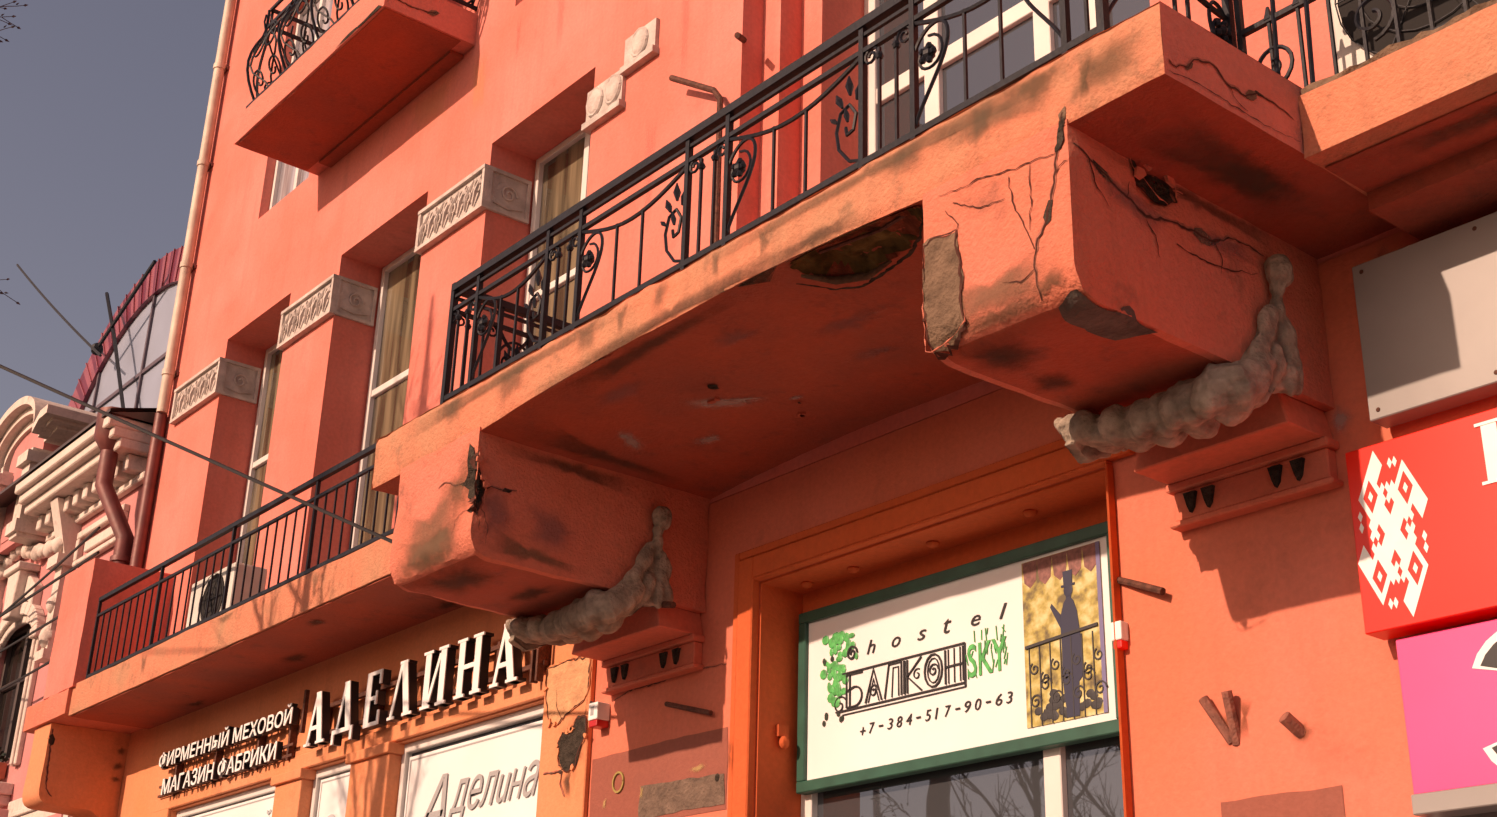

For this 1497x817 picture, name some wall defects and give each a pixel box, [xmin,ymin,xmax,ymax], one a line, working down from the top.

crack [1169,57,1300,142]
water stain [802,227,833,246]
water stain [773,75,1044,228]
crack [940,106,1264,301]
hole [1130,158,1179,206]
spalling [790,206,966,360]
spalling [463,444,491,515]
water stain [414,481,462,569]
water stain [507,544,559,565]
flaking render [543,656,591,772]